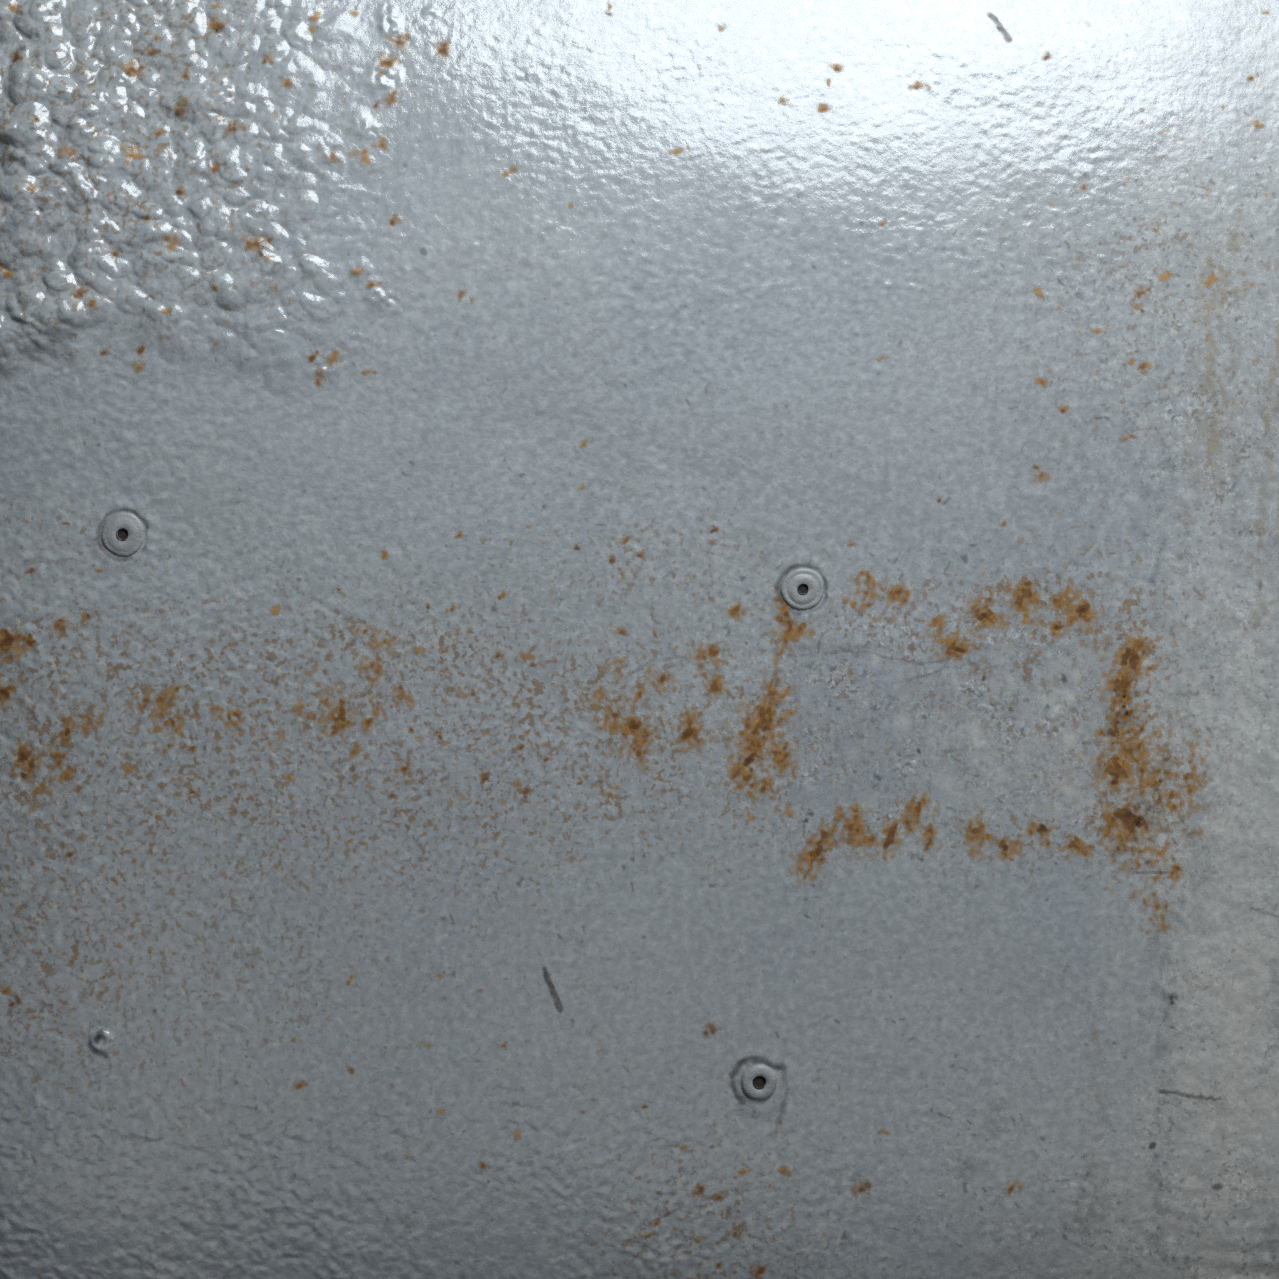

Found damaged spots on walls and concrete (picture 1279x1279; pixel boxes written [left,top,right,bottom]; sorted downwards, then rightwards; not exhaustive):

corrosion [123,36,158,76]
corrosion [381,35,409,75]
corrosion [774,597,814,664]
corrosion [845,571,910,608]
corrosion [1010,581,1093,635]
corrosion [12,713,103,811]
corrosion [296,692,379,736]
corrosion [594,685,653,759]
corrosion [681,712,704,747]
corrosion [728,681,795,799]
corrosion [965,637,1204,869]
corrosion [798,794,935,880]